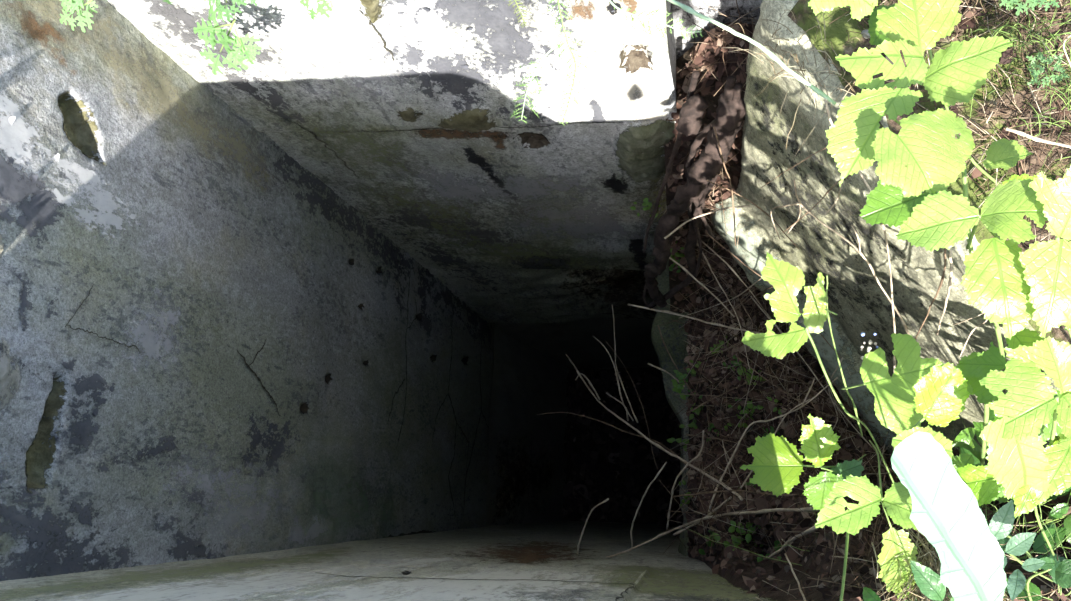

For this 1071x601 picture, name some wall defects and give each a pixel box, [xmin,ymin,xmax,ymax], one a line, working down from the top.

corrosion [9,2,75,75]
peeling [360,0,581,132]
corrosion [620,0,638,29]
spalling [619,45,654,74]
peeling [0,85,138,251]
corrosion [415,128,508,150]
peeling [16,274,34,331]
crack [65,286,145,353]
crack [237,340,280,416]
peeling [0,343,141,581]
peeling [97,434,178,472]